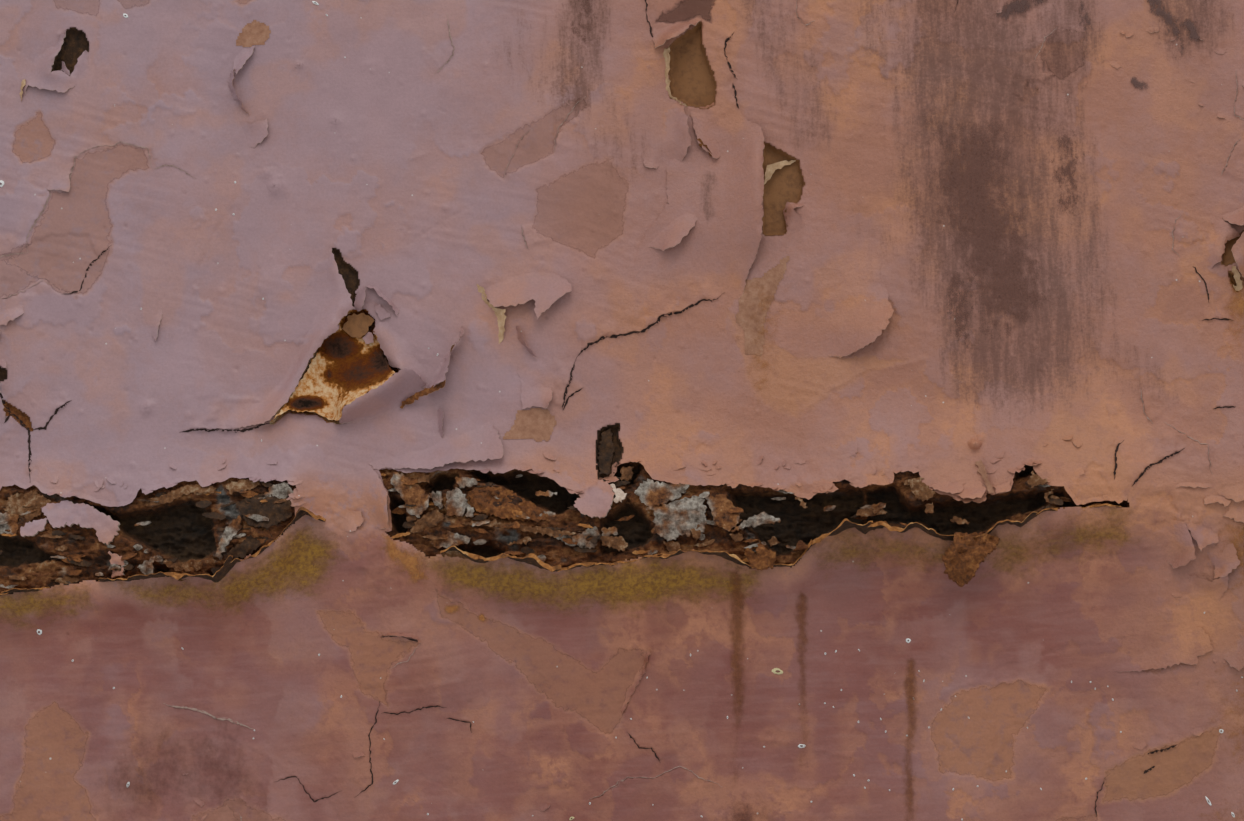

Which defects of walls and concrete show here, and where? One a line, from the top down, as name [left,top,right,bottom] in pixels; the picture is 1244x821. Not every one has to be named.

peeling [19,27,89,101]
damp [998,0,1044,20]
damp [1147,0,1200,54]
peeling [632,0,894,358]
damp [925,121,1059,347]
damp [1052,137,1085,211]
peeling [219,247,464,431]
peeling [477,272,572,358]
crack [562,293,723,410]
crack [0,392,72,476]
spalling [0,473,326,596]
spalling [369,366,1129,587]